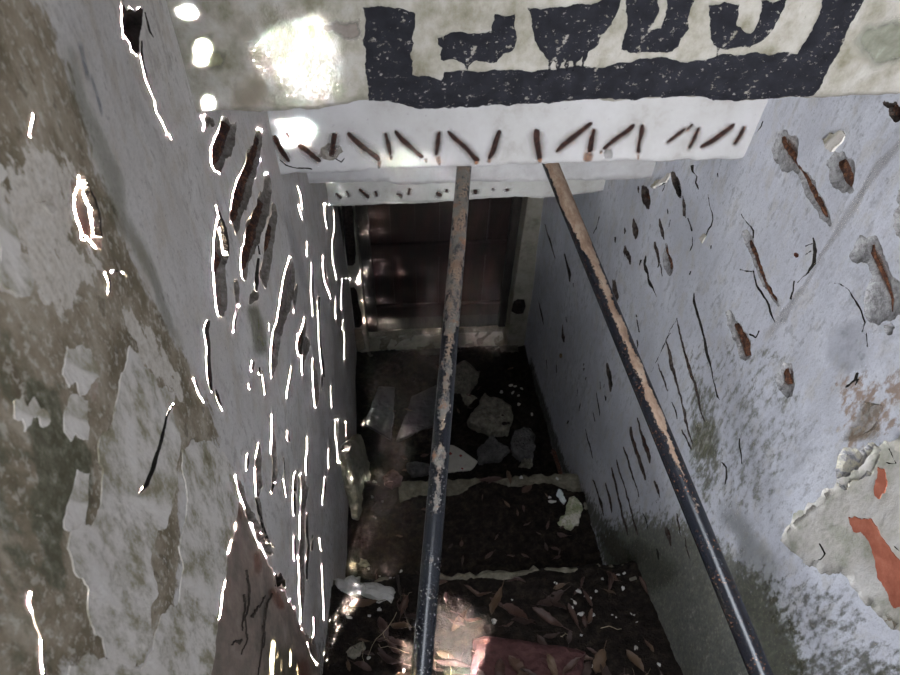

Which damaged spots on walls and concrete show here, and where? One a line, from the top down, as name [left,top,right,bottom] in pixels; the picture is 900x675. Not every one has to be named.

crack [140,12,172,140]
spalling [74,175,103,249]
spalling [201,114,237,174]
spalling [212,128,278,333]
corrosion [273,132,290,162]
corrosion [297,130,502,168]
corrosion [533,129,542,163]
corrosion [556,121,644,161]
spalling [772,129,832,227]
spalling [849,235,900,335]
crack [139,403,175,493]
peeling [62,345,320,675]